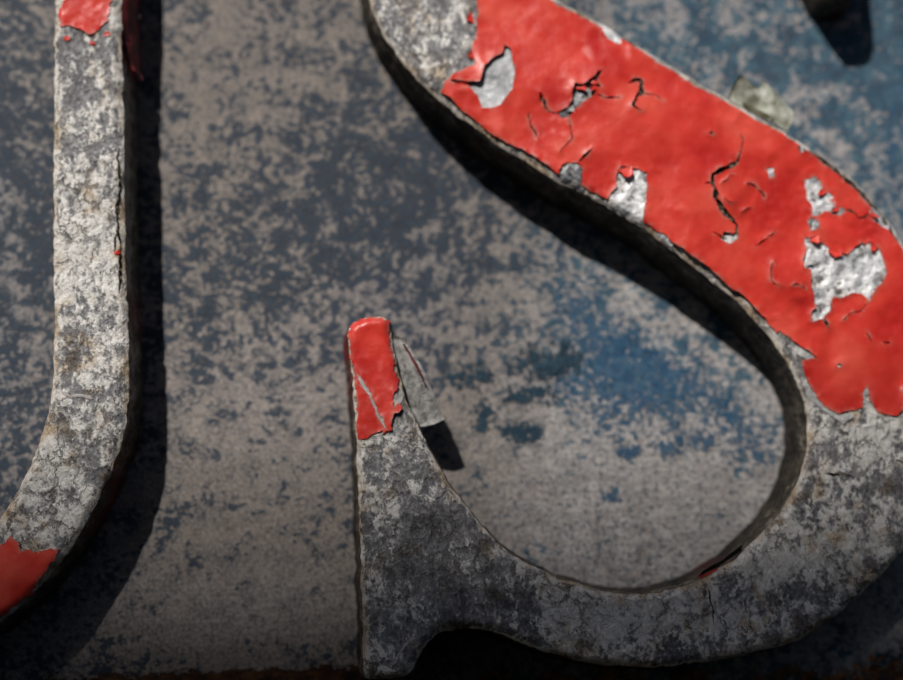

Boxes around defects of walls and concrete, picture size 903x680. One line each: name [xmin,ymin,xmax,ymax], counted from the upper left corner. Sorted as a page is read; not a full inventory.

peeling [121,0,143,81]
peeling [374,0,515,108]
crack [528,93,592,162]
peeling [555,71,601,118]
crack [599,78,644,108]
peeling [727,75,794,131]
crack [114,147,122,291]
peeling [604,164,647,227]
crack [705,136,775,245]
peeling [803,177,889,321]
peeling [444,279,784,477]
rust [48,663,365,680]